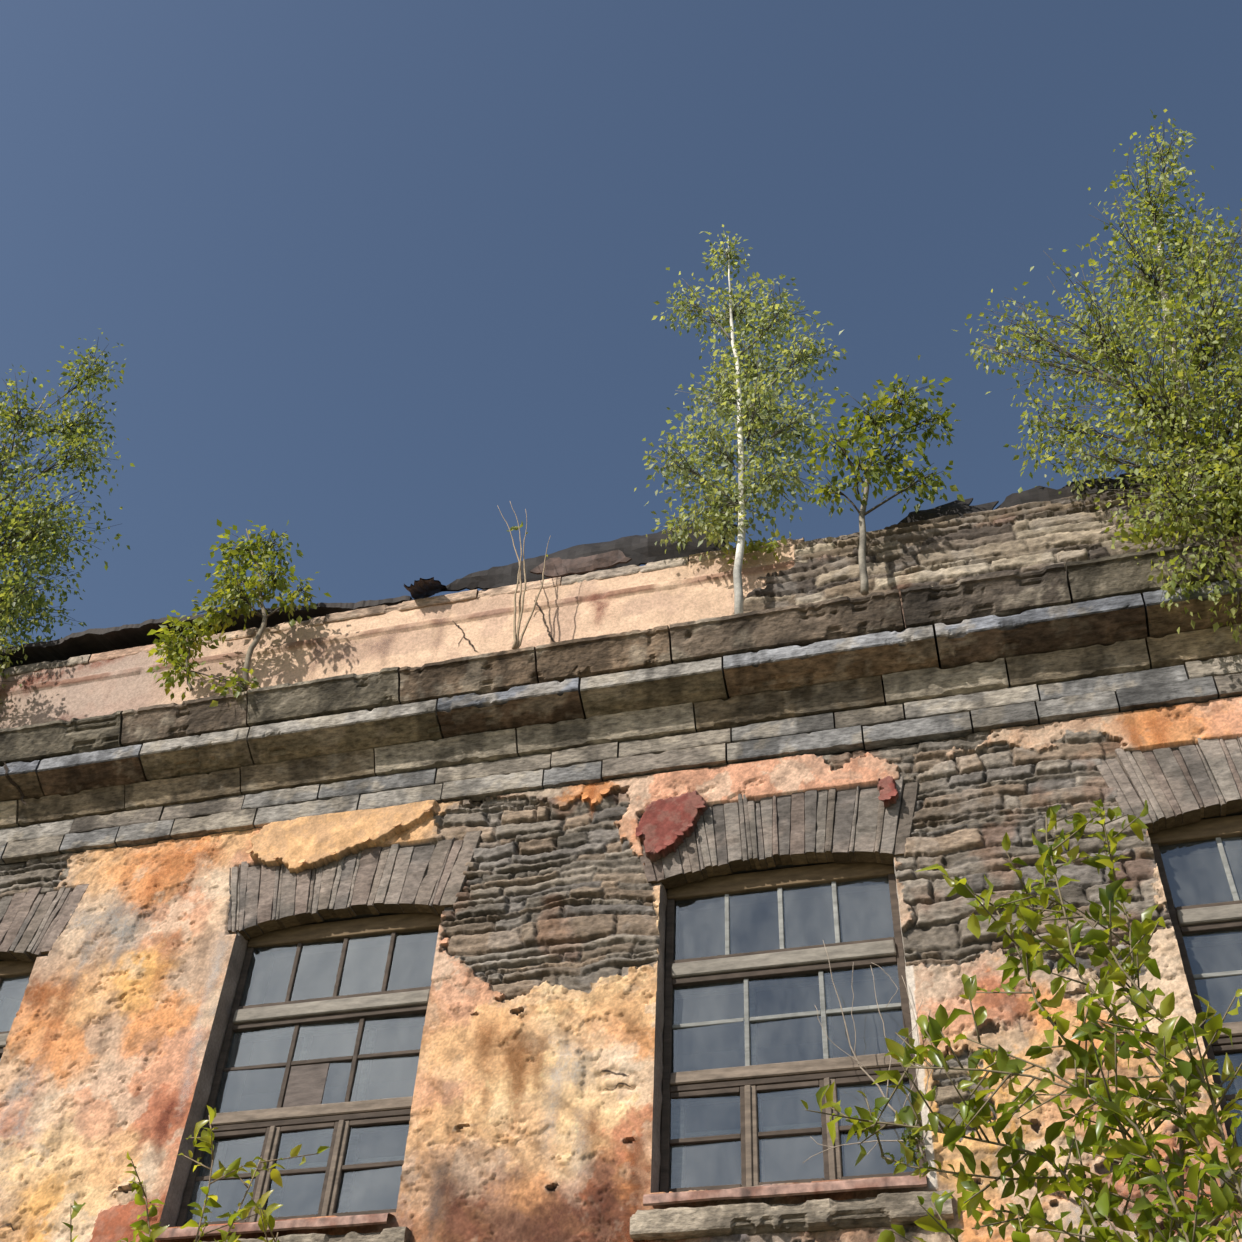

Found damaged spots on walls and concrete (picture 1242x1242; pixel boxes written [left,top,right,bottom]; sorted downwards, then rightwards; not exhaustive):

crack [453,621,478,652]
spalling [814,729,1173,981]
spalling [246,781,708,1016]
spalling [931,1018,1001,1143]
spalling [1030,1118,1042,1134]
hole [1094,1158,1123,1175]
peeling [89,1183,158,1242]